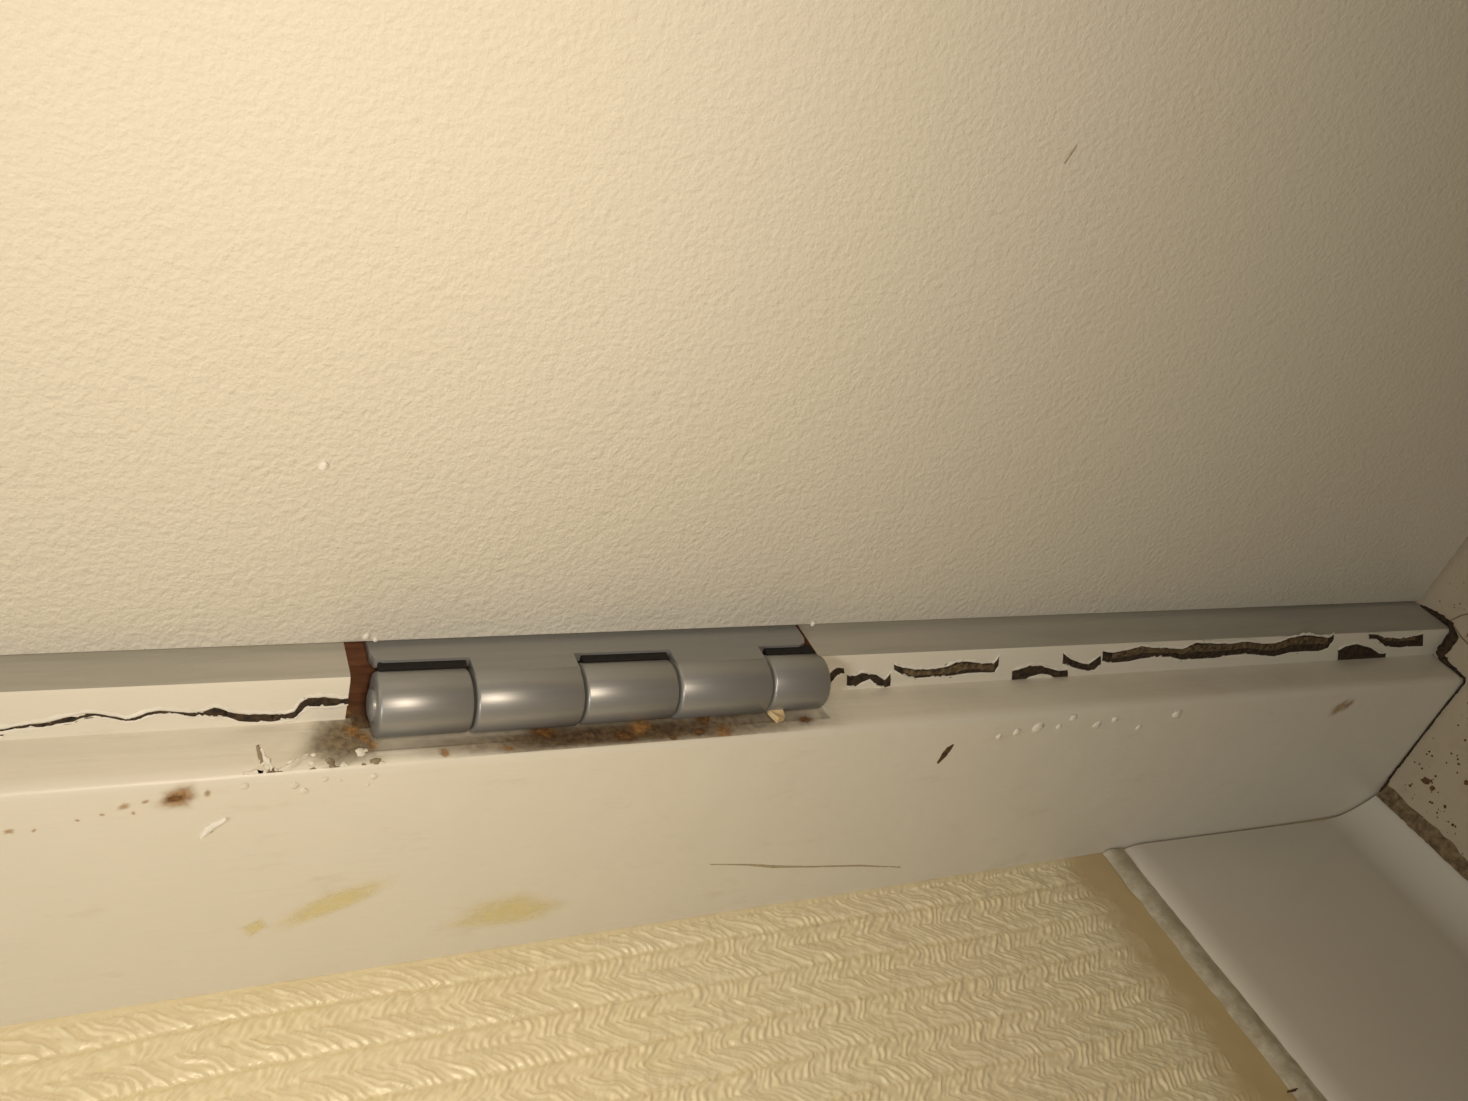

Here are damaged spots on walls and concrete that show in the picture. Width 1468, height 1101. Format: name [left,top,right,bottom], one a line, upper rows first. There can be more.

crack [829,631,1424,689]
crack [0,693,349,738]
corrosion [314,710,376,758]
corrosion [442,714,766,756]